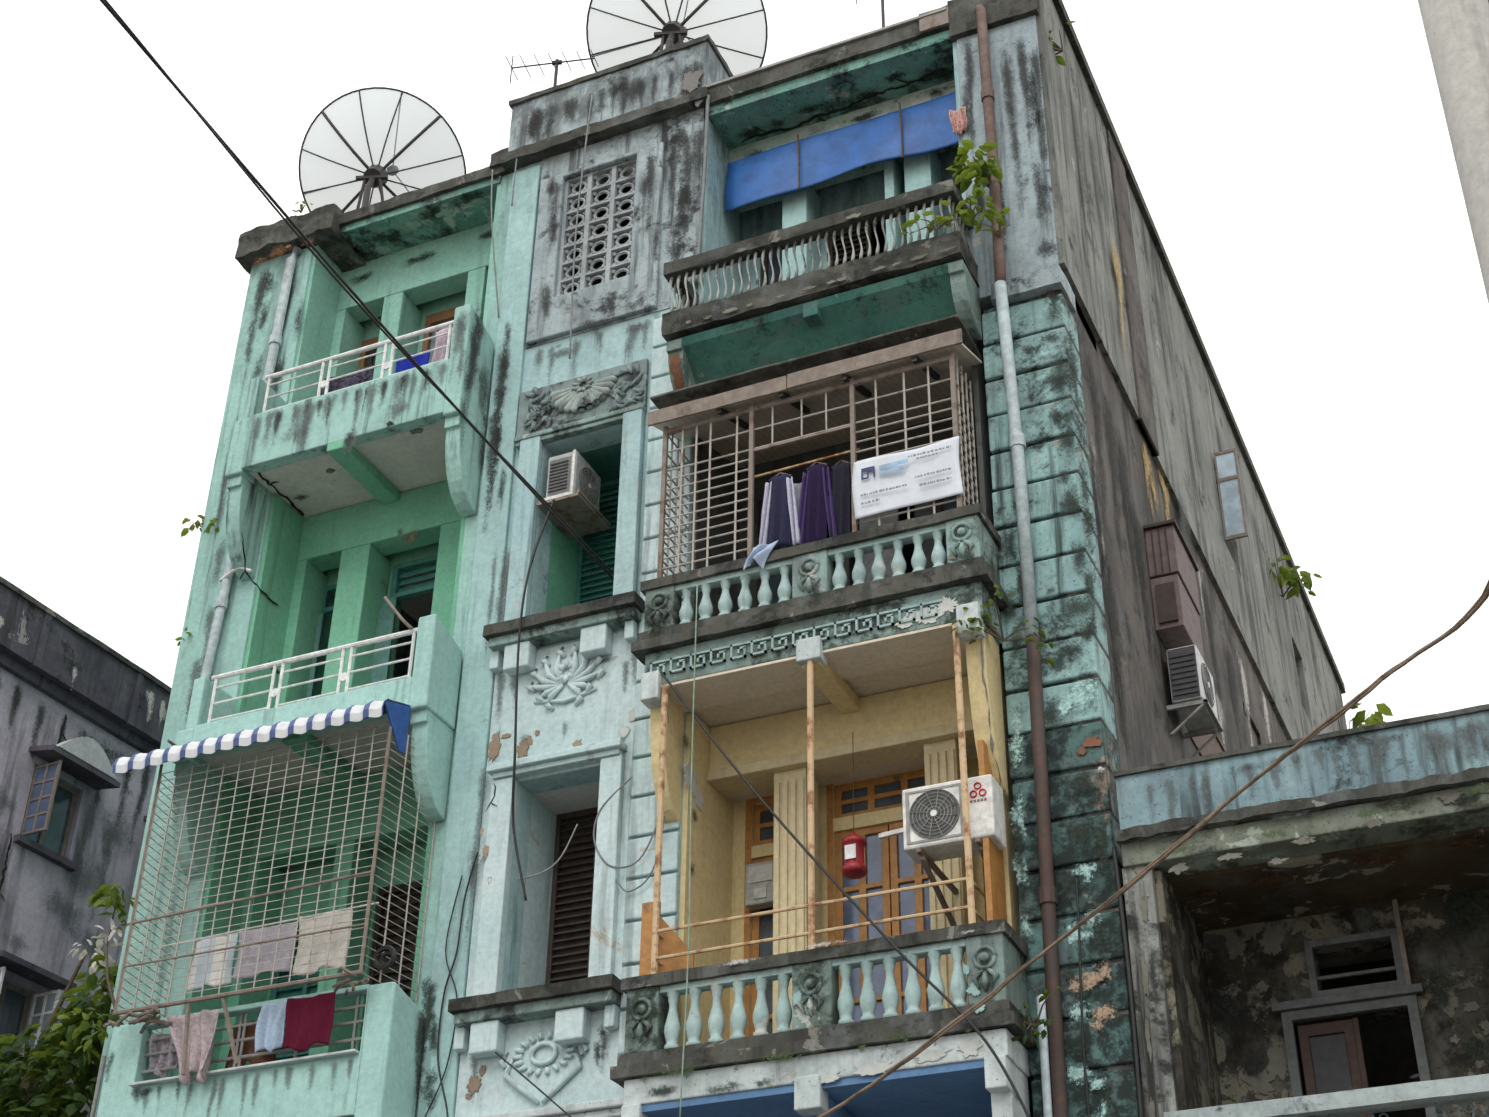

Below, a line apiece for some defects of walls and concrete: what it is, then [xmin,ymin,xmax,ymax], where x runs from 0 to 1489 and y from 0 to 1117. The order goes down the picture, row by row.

leakage [527,62,703,157]
leakage [963,43,975,140]
leakage [1002,41,1049,218]
leakage [539,174,562,246]
leakage [625,130,704,256]
leakage [246,272,511,505]
crack [258,472,304,516]
leakage [146,691,166,722]
peeling [488,730,540,763]
leakage [74,751,151,889]
peeling [1225,921,1286,960]
peeling [1241,1039,1288,1096]